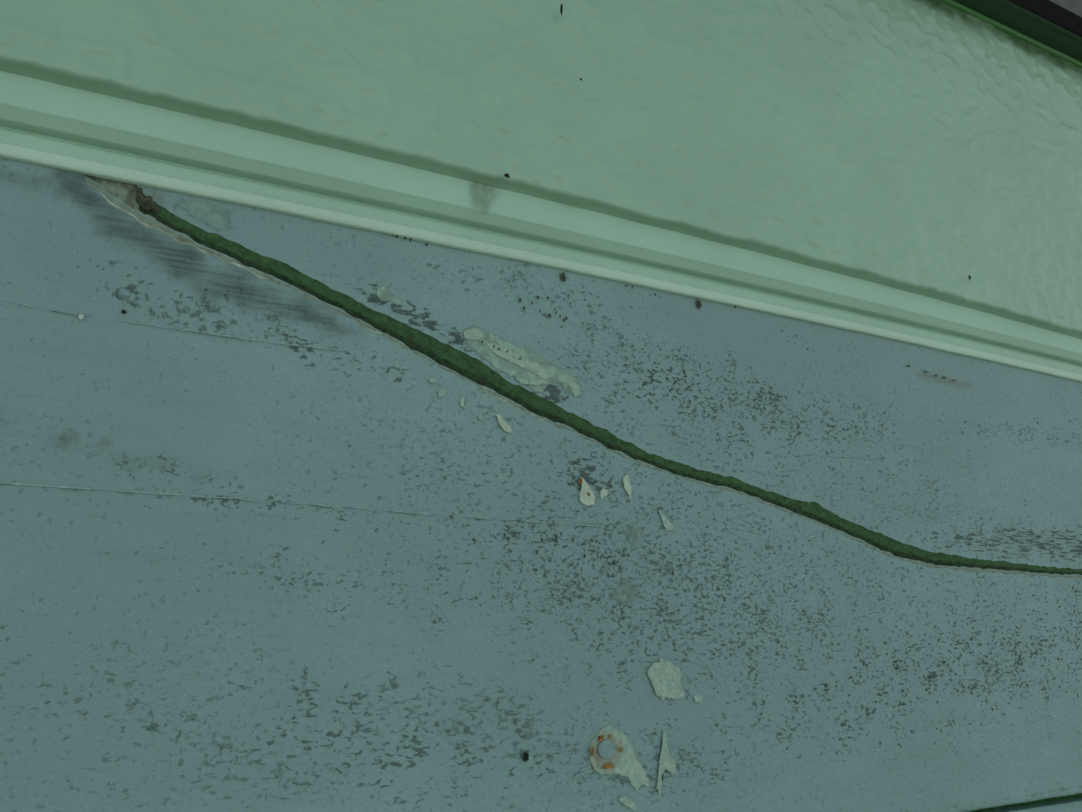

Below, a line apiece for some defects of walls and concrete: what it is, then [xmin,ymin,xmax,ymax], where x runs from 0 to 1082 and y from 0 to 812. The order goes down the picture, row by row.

peeling [361,284,582,403]
crack [0,175,1082,579]
peeling [561,458,632,506]
peeling [647,658,704,702]
peeling [588,724,678,810]